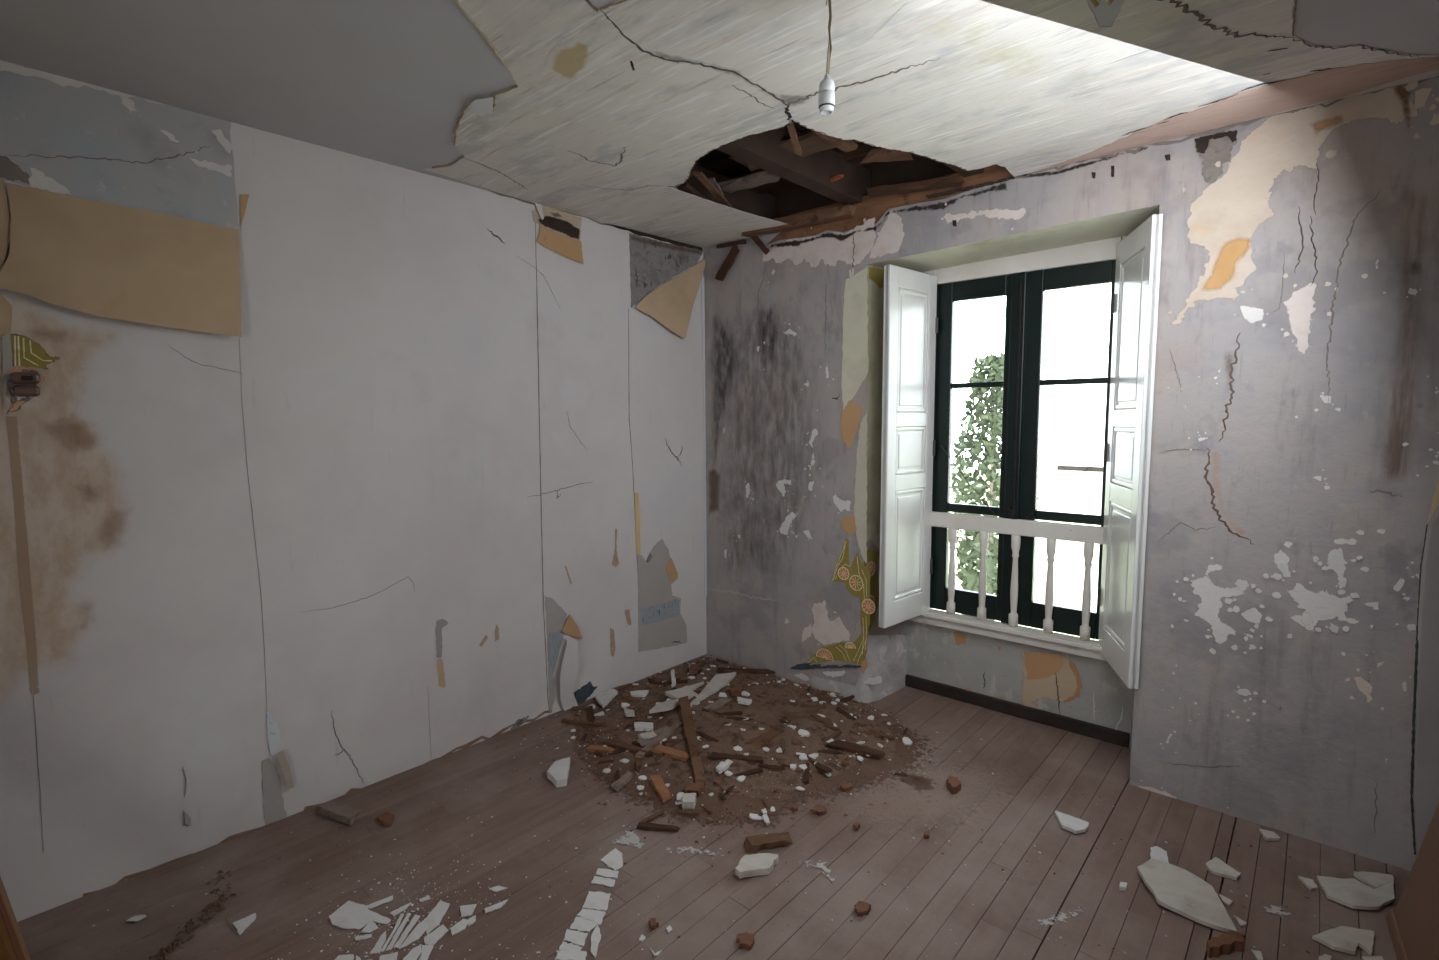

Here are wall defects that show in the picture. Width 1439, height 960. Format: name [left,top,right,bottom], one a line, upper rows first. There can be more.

peeling [423,0,1439,563]
crack [1273,164,1380,402]
damp [0,288,139,716]
peeling [635,493,687,652]
mould [706,277,841,599]
spalling [785,600,851,646]
crack [1158,333,1256,544]
spalling [1170,529,1385,655]
spalling [1345,651,1385,710]
spalling [1393,561,1419,601]